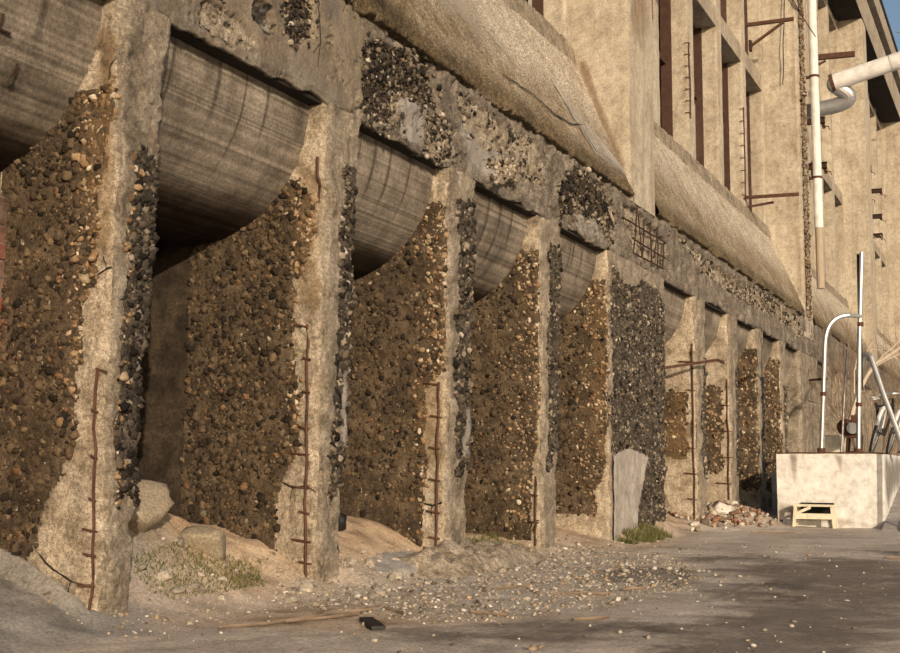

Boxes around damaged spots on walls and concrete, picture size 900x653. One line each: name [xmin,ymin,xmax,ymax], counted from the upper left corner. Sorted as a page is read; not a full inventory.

spalling [0,75,121,561]
spalling [77,367,108,611]
spalling [113,145,160,510]
spalling [180,157,321,577]
spalling [359,31,545,190]
spalling [327,162,789,549]
spalling [551,77,627,176]
spalling [678,0,813,340]